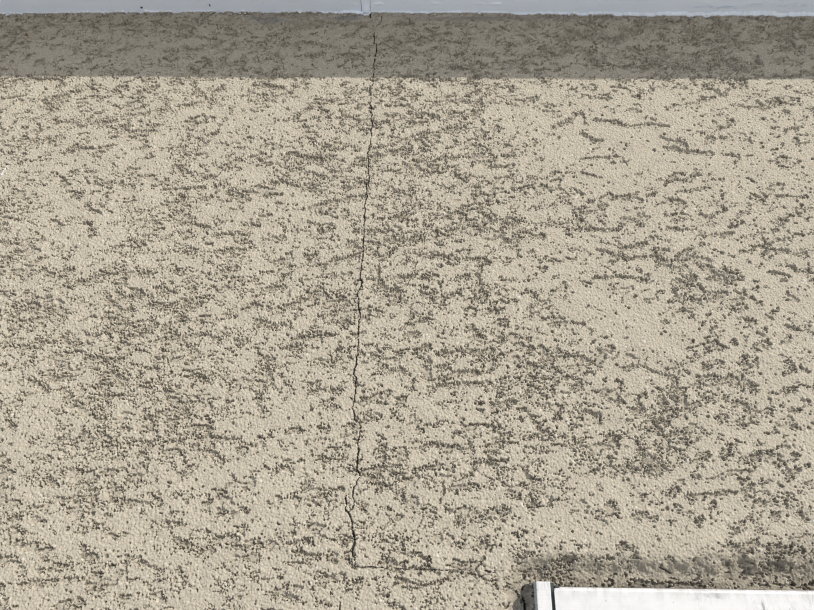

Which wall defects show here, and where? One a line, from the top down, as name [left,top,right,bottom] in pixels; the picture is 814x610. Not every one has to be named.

crack [345,10,533,596]